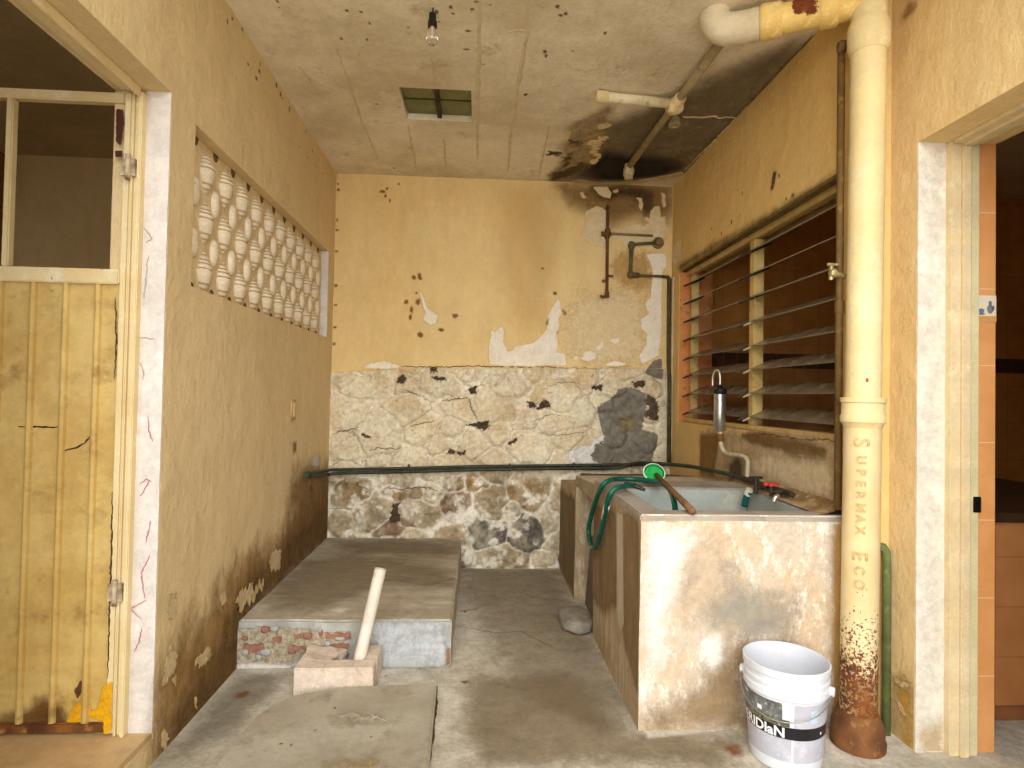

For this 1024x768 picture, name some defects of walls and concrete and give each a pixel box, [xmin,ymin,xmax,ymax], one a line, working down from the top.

rust [791,0,819,19]
peeling [488,108,683,367]
damp [680,176,836,270]
crack [401,365,617,426]
crack [328,481,437,510]
peeling [220,549,281,613]
damp [153,466,455,753]
peeling [162,643,178,687]
peeling [195,646,212,668]